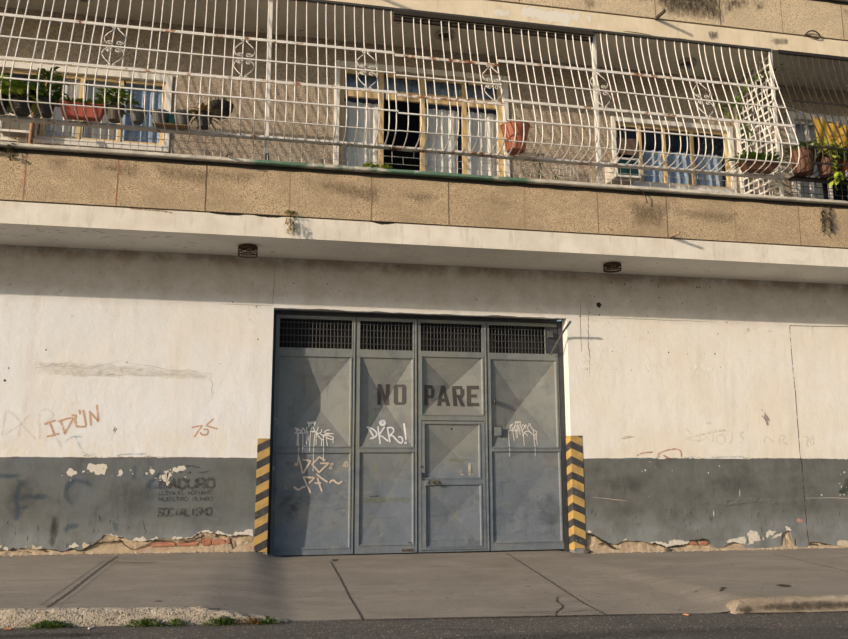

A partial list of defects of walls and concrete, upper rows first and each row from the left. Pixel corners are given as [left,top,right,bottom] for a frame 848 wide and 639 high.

peeling [521,7,592,26]
water stain [660,0,720,18]
peeling [62,455,186,486]
spalling [0,529,255,556]
spalling [584,526,848,553]
crack [392,595,633,631]